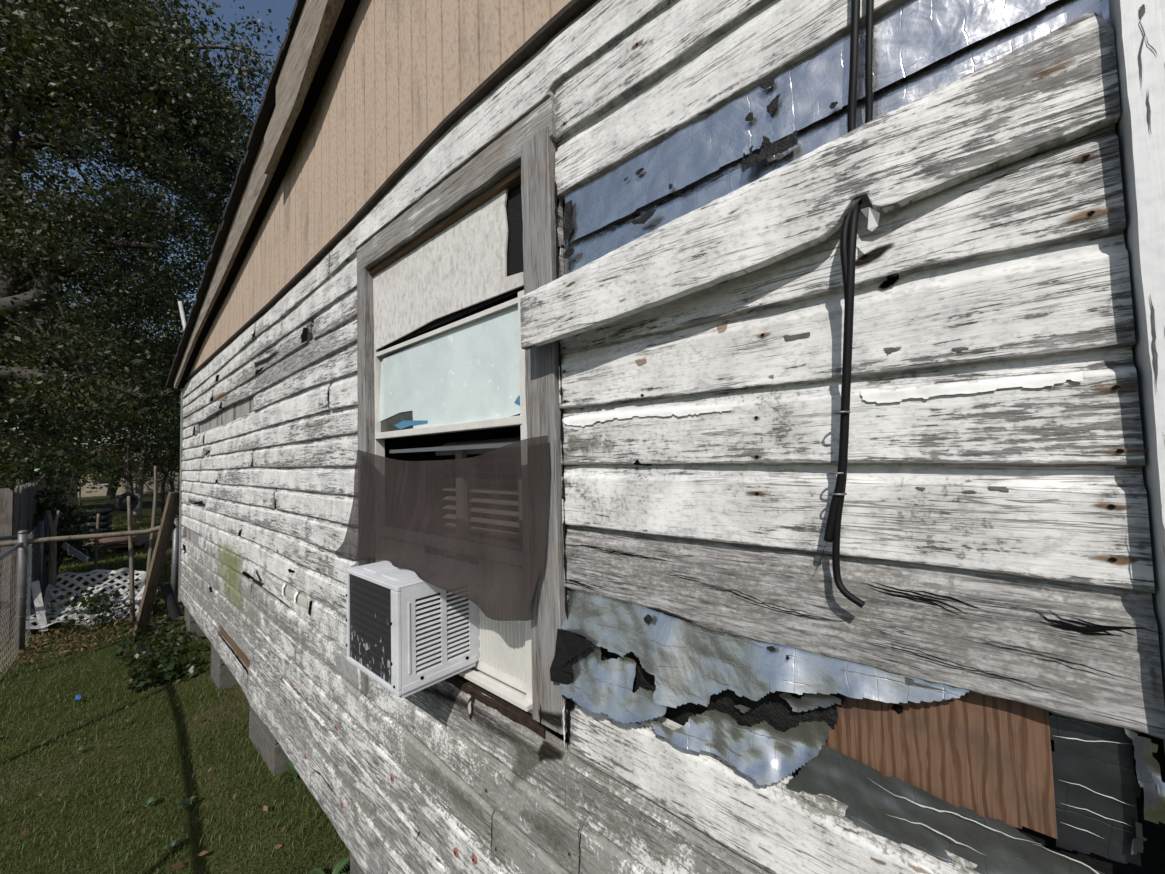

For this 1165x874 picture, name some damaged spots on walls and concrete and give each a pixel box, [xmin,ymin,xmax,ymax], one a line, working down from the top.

crack [1139,5,1158,134]
peeling [743,135,763,155]
peeling [860,207,880,231]
crack [1150,295,1158,390]
crack [564,544,1163,705]
peeling [779,692,841,712]
peeling [905,677,958,702]